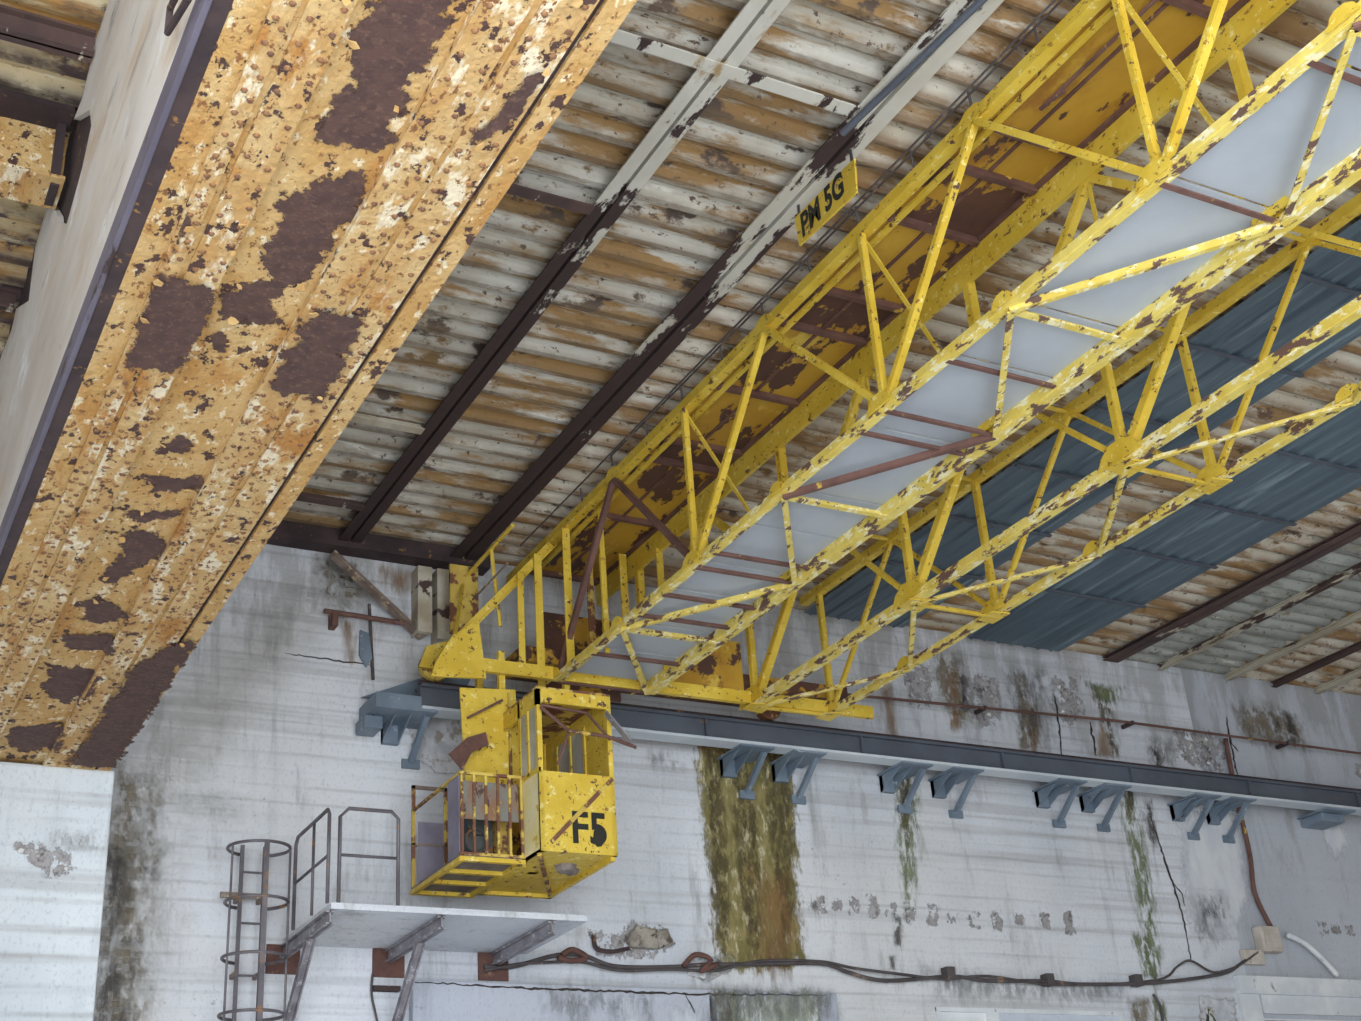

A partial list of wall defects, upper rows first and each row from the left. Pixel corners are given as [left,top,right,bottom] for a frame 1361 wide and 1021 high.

peeling [313,0,458,154]
peeling [122,169,372,404]
peeling [160,435,195,454]
peeling [5,473,212,768]
damp [935,653,967,726]
damp [1014,675,1041,749]
damp [1085,683,1125,702]
damp [1124,791,1157,844]
peeling [14,841,72,878]
damp [701,746,795,968]
damp [95,775,160,1021]
damp [1133,934,1156,978]